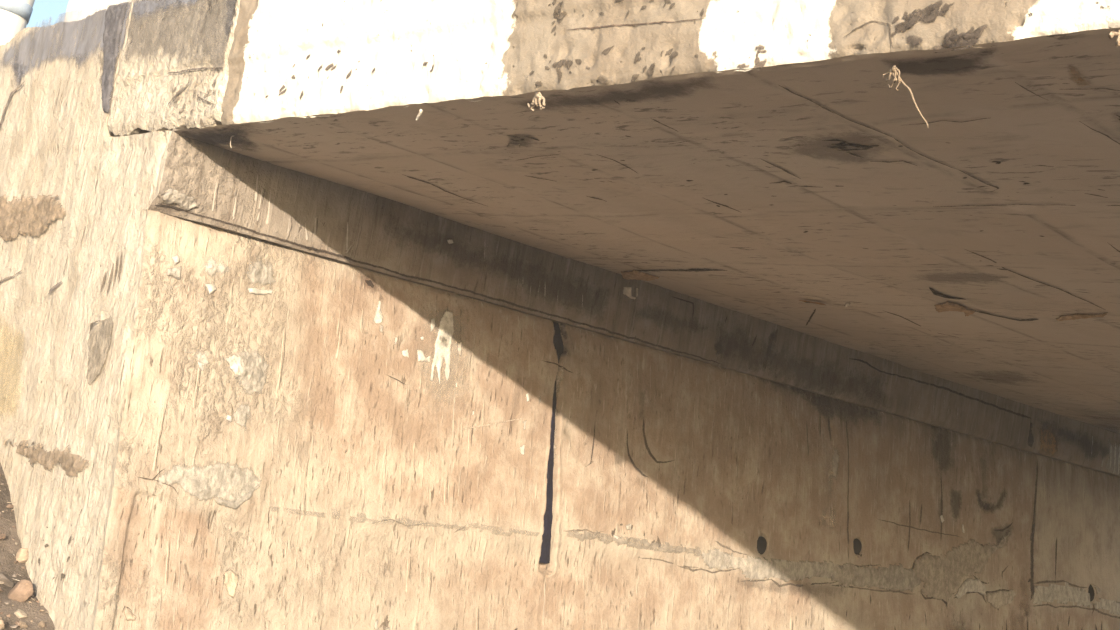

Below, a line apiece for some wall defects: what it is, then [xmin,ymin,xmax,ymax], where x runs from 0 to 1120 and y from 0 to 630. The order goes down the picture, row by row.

leakage [530,84,692,108]
crack [779,85,1031,207]
leakage [896,58,978,75]
spalling [0,193,65,241]
crack [539,322,603,564]
crack [922,422,1057,630]